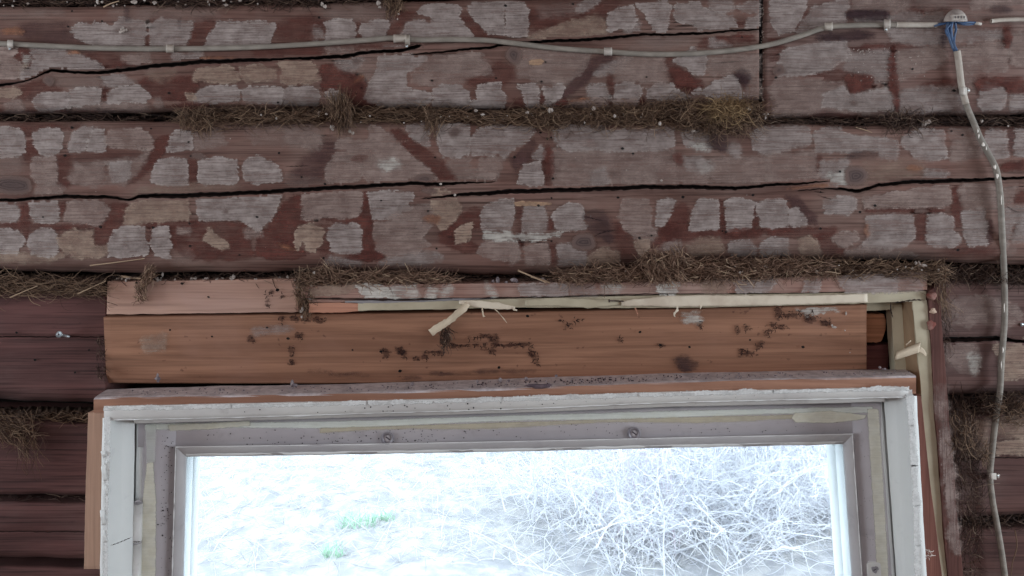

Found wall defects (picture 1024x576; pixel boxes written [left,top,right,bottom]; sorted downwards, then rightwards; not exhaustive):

peeling [0,46,162,112]
peeling [71,16,342,107]
crack [0,22,759,87]
peeling [293,0,1024,266]
peeling [0,126,282,263]
crack [0,165,1024,236]